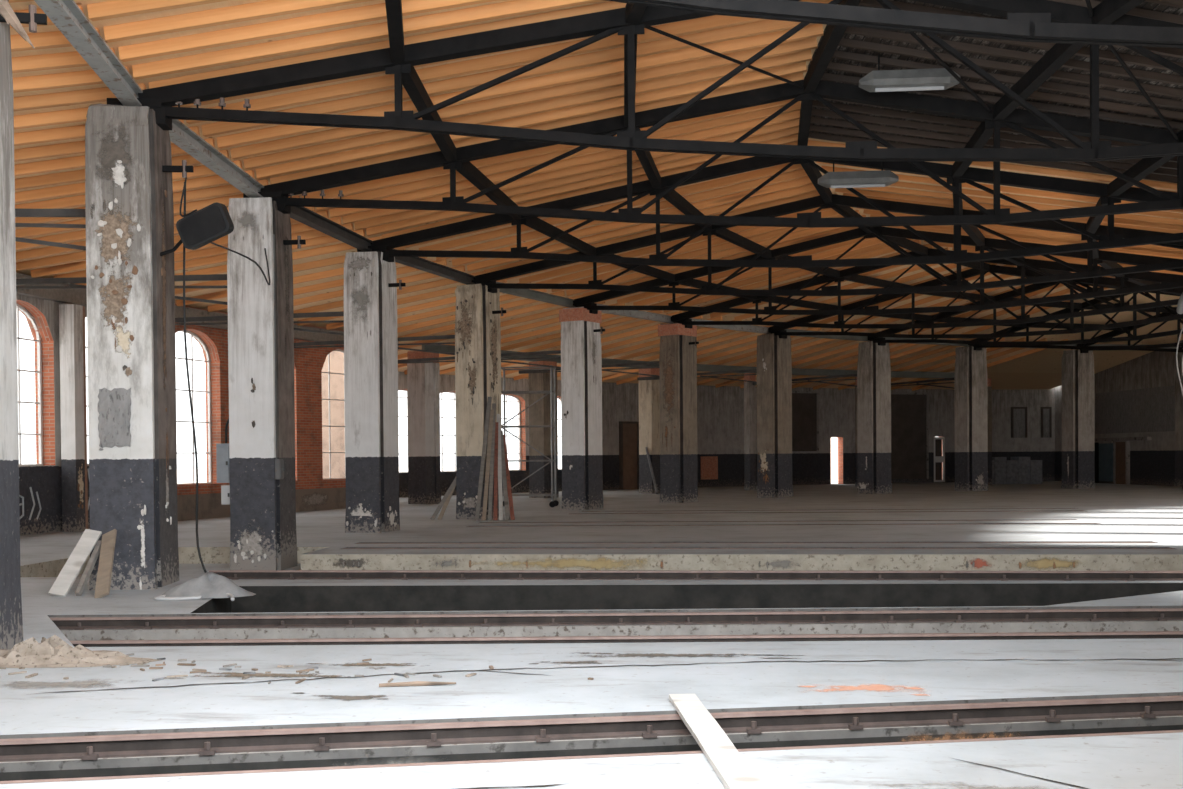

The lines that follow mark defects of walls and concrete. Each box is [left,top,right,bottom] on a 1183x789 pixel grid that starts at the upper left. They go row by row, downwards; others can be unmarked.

flaking render [91,160,143,451]
spalling [346,503,397,527]
peeling [234,527,273,566]